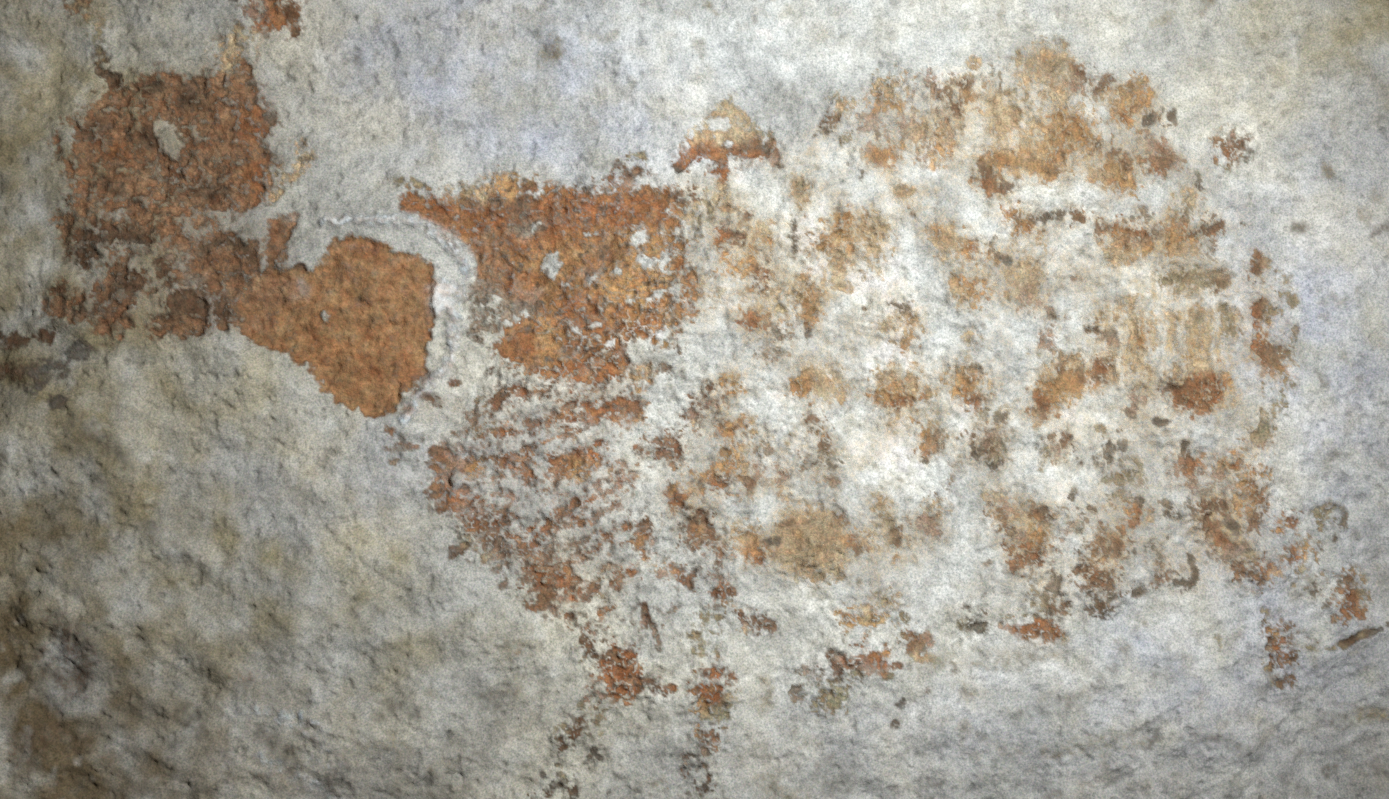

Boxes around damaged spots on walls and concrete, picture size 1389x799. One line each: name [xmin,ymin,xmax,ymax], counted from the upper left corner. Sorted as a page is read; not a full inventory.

rust [223,0,302,71]
rust [1213,128,1254,170]
spalling [0,35,1013,671]
rust [1238,249,1299,389]
rust [1125,360,1235,427]
rust [1321,566,1371,625]
peeling [788,586,937,715]
rust [1260,609,1300,689]